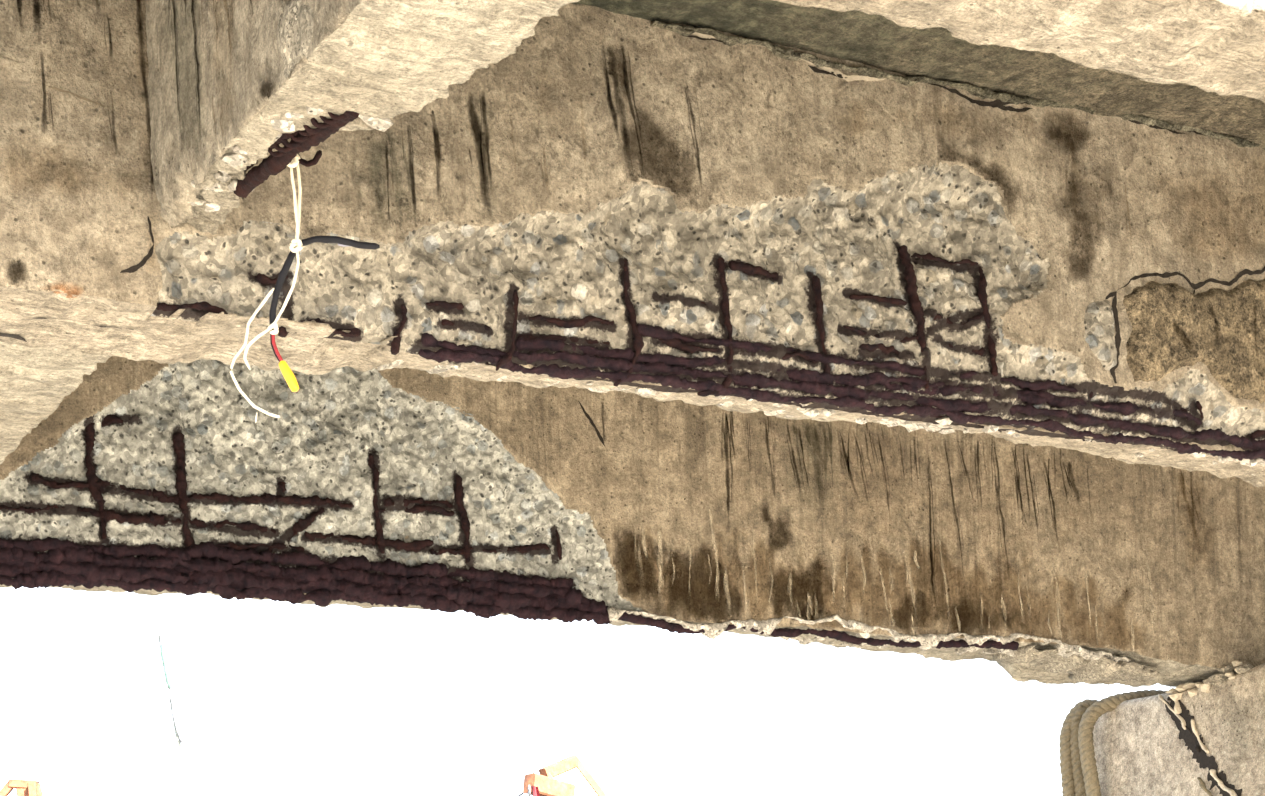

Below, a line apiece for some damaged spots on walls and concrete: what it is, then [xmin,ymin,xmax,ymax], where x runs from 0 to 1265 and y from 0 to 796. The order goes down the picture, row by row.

leakage [17,0,44,22]
leakage [42,59,53,125]
leakage [605,50,684,191]
leakage [685,88,701,179]
spalling [0,160,1265,683]
leakage [723,411,734,510]
leakage [842,424,885,482]
leakage [913,443,935,588]
leakage [945,443,1006,548]
leakage [1015,448,1072,527]
leakage [613,533,740,620]
crack [1158,694,1242,796]